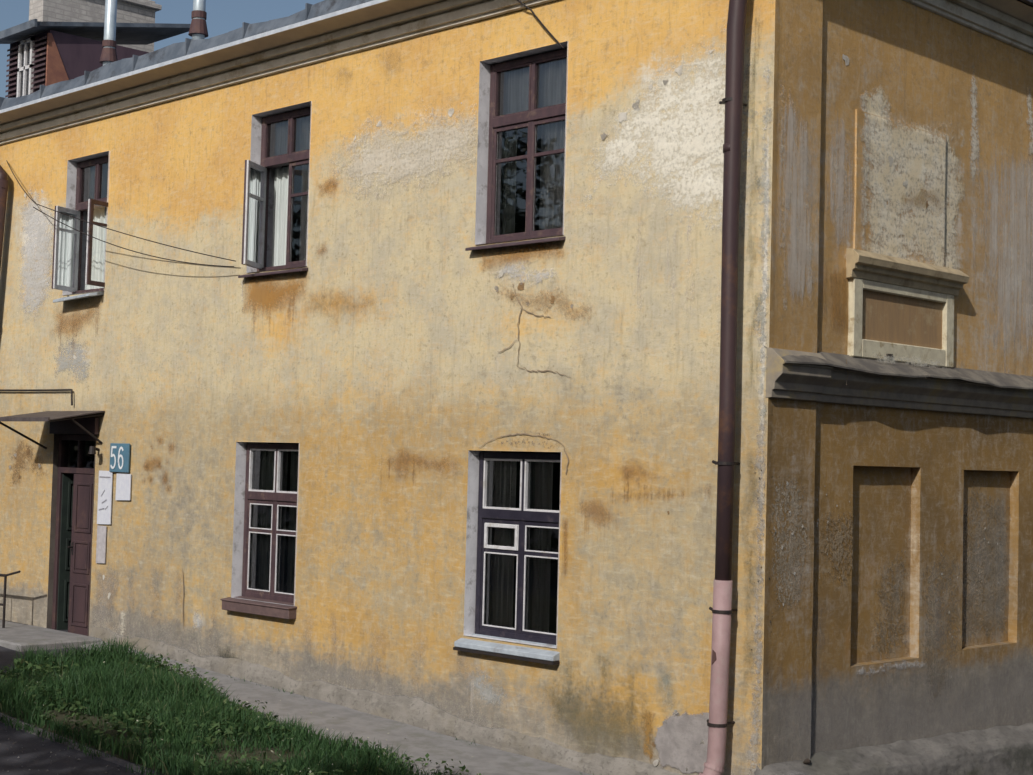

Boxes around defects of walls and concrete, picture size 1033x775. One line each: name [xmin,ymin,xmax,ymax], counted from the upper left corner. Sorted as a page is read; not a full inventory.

peeling [586,45,726,230]
peeling [831,88,964,269]
crack [497,287,564,375]